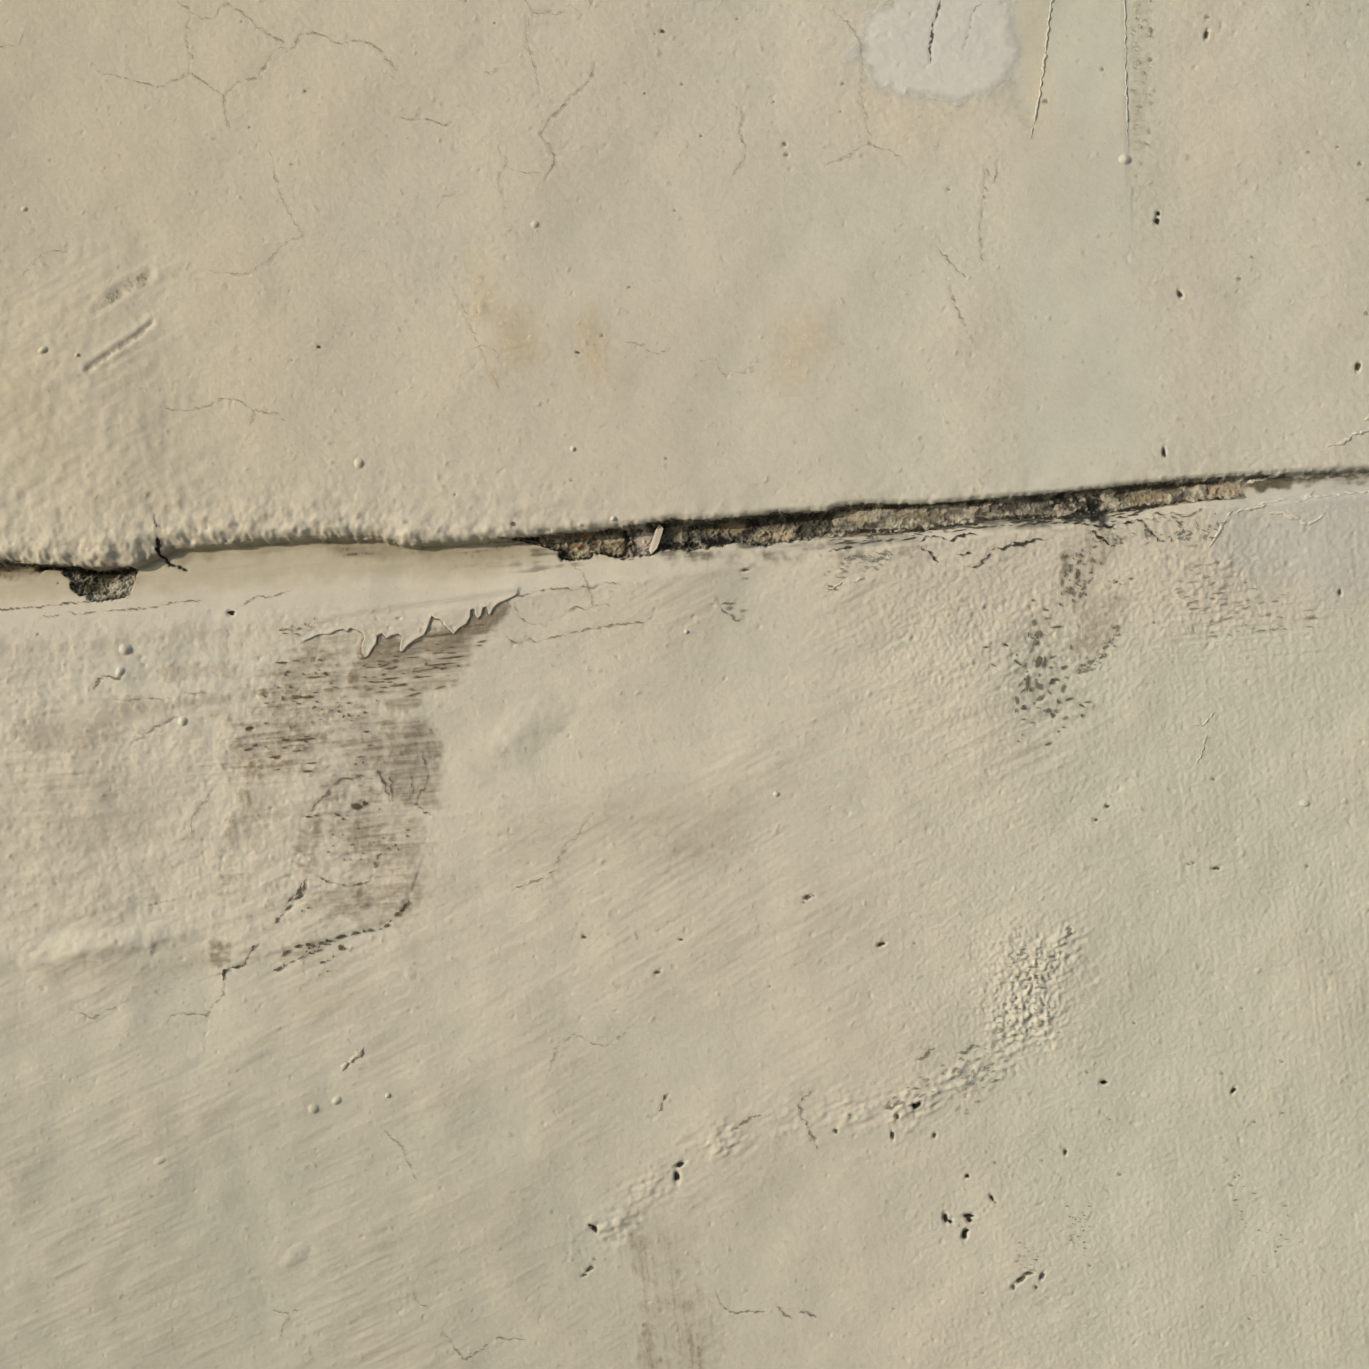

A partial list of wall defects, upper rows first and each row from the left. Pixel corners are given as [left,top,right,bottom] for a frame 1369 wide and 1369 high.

crack [104,4,398,113]
spalling [0,561,138,601]
crack [0,520,200,616]
crack [834,474,1358,568]
water stain [360,605,507,659]